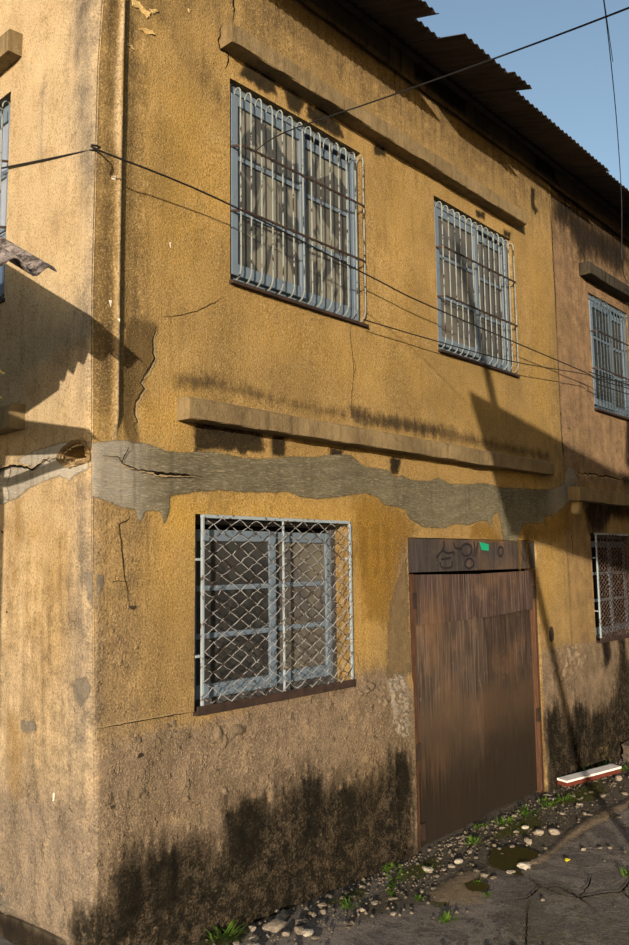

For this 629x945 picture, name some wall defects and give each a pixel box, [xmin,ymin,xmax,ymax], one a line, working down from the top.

peeling [131,0,159,36]
crack [0,457,57,471]
spalling [56,439,90,468]
crack [105,298,222,479]
peeling [358,561,411,738]
water stain [544,639,629,792]
water stain [69,749,416,945]
water stain [0,916,57,945]